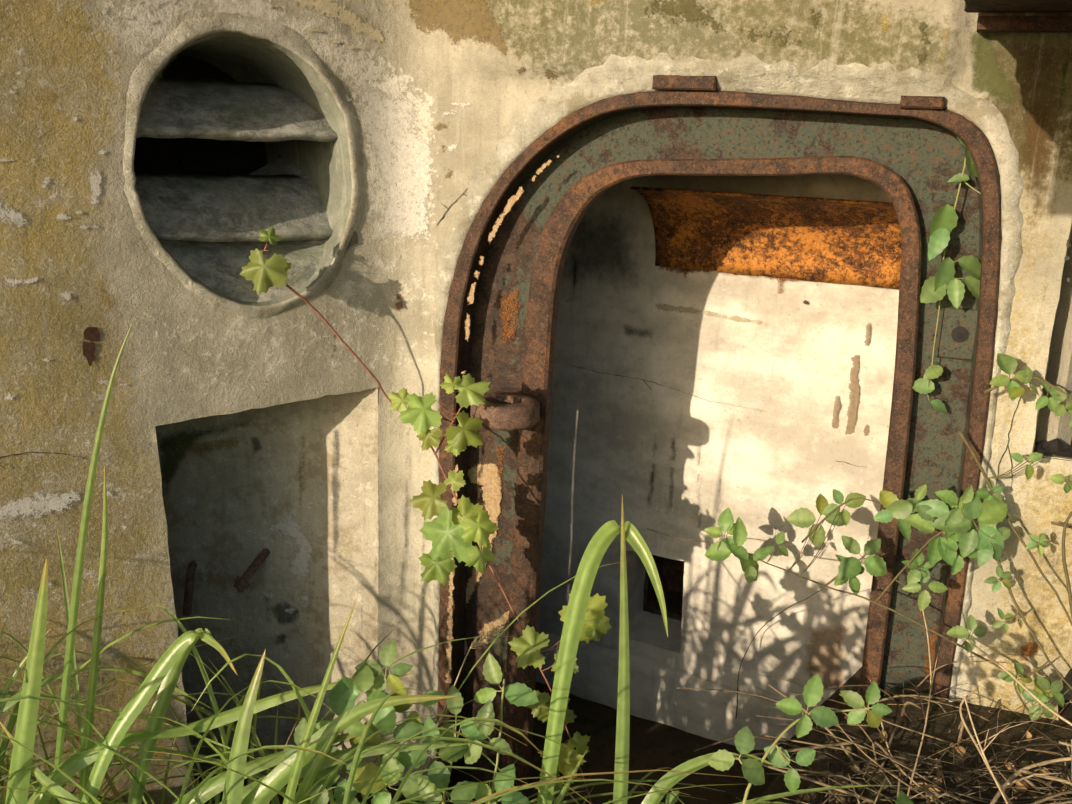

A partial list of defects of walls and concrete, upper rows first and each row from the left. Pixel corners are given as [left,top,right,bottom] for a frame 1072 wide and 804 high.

peeling [409,0,507,56]
water stain [917,21,930,64]
peeling [0,196,39,228]
peeling [488,155,559,242]
peeling [465,256,484,341]
rust [499,289,520,344]
rust [660,266,798,293]
rust [82,327,100,366]
crack [0,452,91,469]
peeling [445,558,487,684]